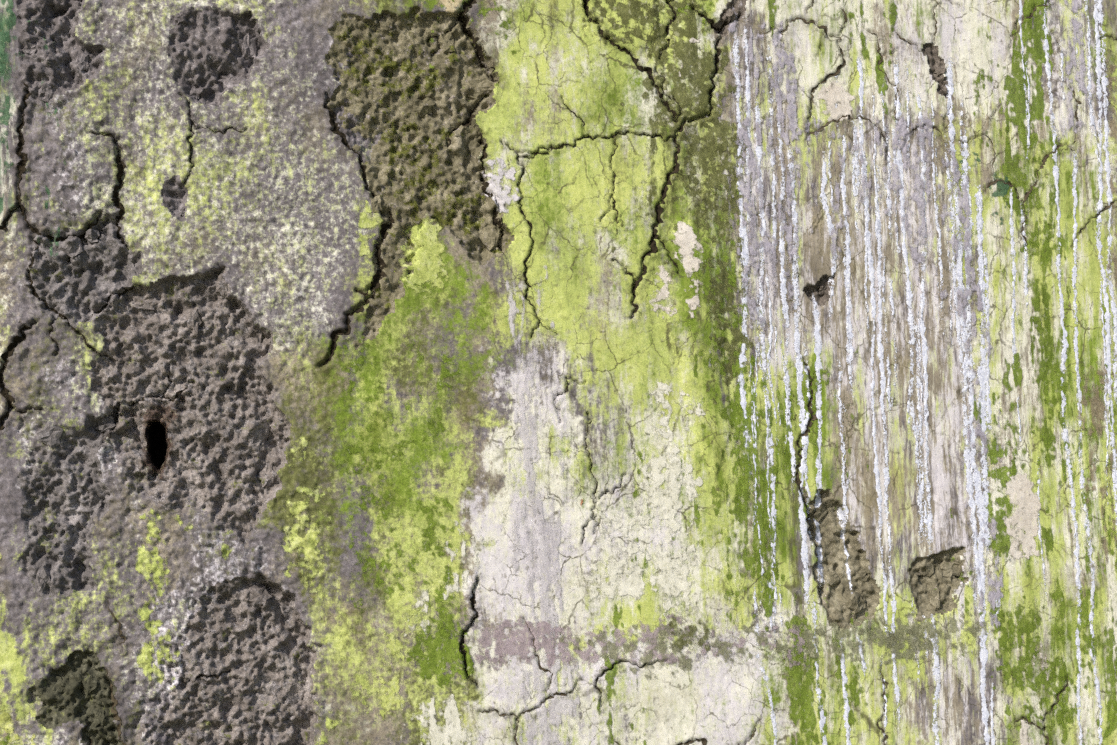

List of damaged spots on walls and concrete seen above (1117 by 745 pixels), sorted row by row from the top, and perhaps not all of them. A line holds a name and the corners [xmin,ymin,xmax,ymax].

crack [0,83,138,430]
spalling [17,203,292,598]
spalling [166,3,269,107]
crack [322,96,394,366]
spalling [325,6,521,350]
crack [427,0,741,338]
damp [475,0,1117,745]
crack [761,0,1082,251]
spalling [28,573,318,745]
crack [459,584,663,745]
spalling [801,487,881,629]
spalling [907,547,969,622]